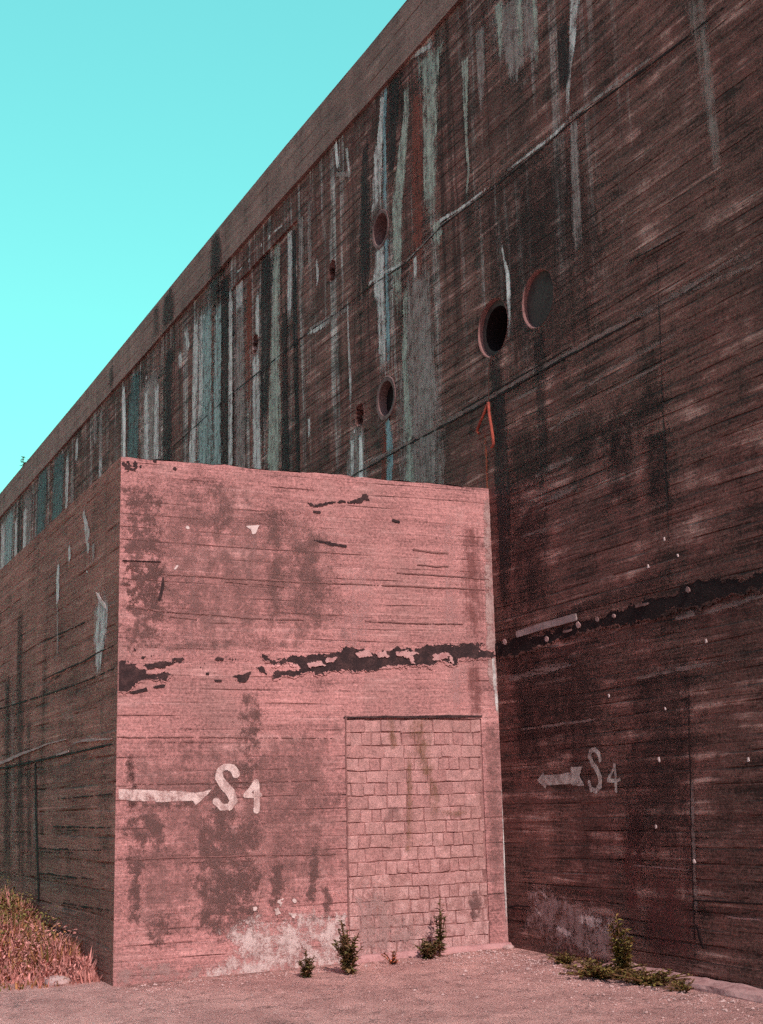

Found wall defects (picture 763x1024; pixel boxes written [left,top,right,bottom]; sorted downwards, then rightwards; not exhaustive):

water stain [433,0,539,244]
water stain [512,0,650,242]
water stain [120,485,178,648]
spalling [118,648,184,696]
spalling [308,494,370,514]
spalling [204,500,763,710]
water stain [117,694,346,985]